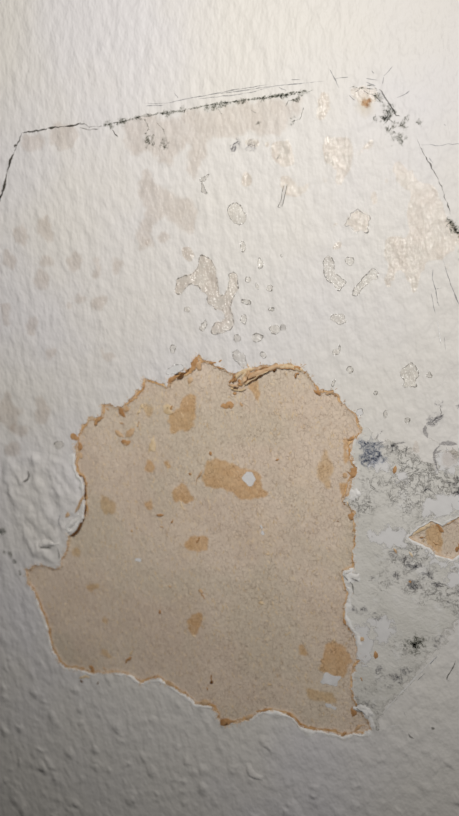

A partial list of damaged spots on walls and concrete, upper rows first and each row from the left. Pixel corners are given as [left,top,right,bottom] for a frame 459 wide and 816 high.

crack [0,123,86,199]
peeling [166,364,184,374]